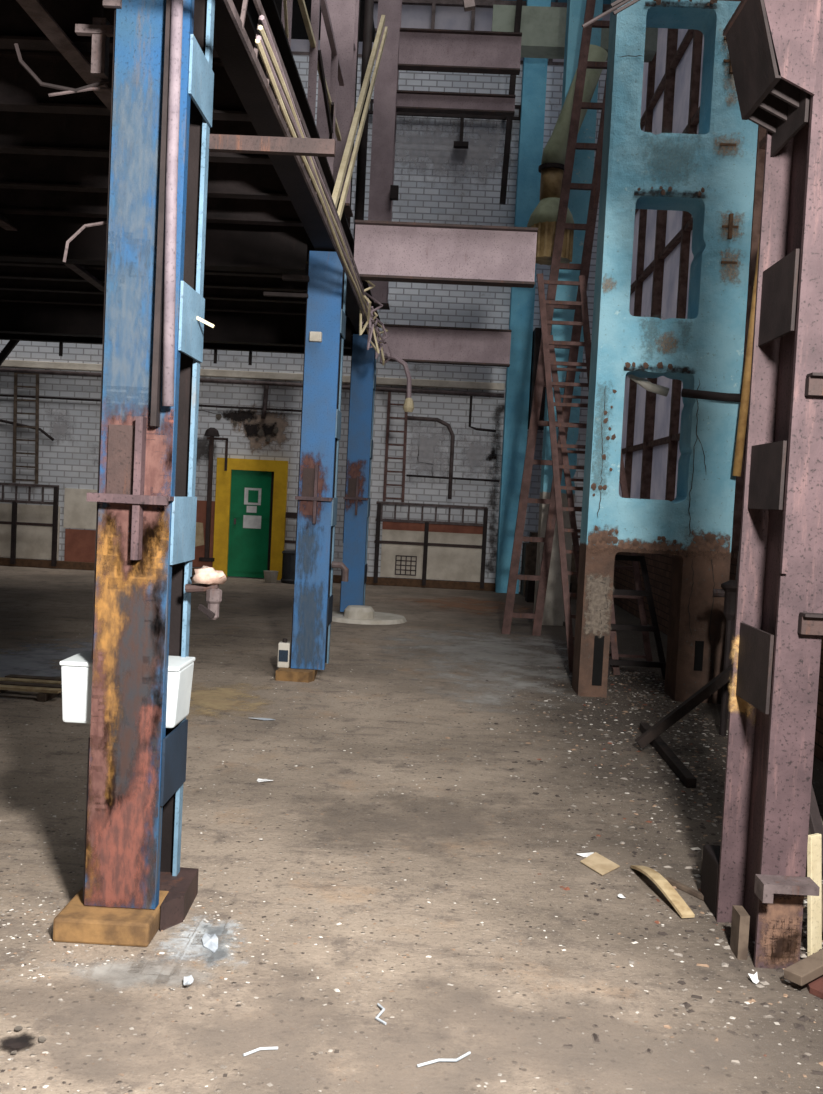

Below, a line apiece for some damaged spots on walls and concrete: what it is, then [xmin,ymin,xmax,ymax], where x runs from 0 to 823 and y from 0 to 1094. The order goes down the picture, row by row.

spalling [216,409,278,442]
rust [345,460,366,509]
rust [296,454,327,669]
peeling [587,525,731,559]
rust [84,408,174,909]